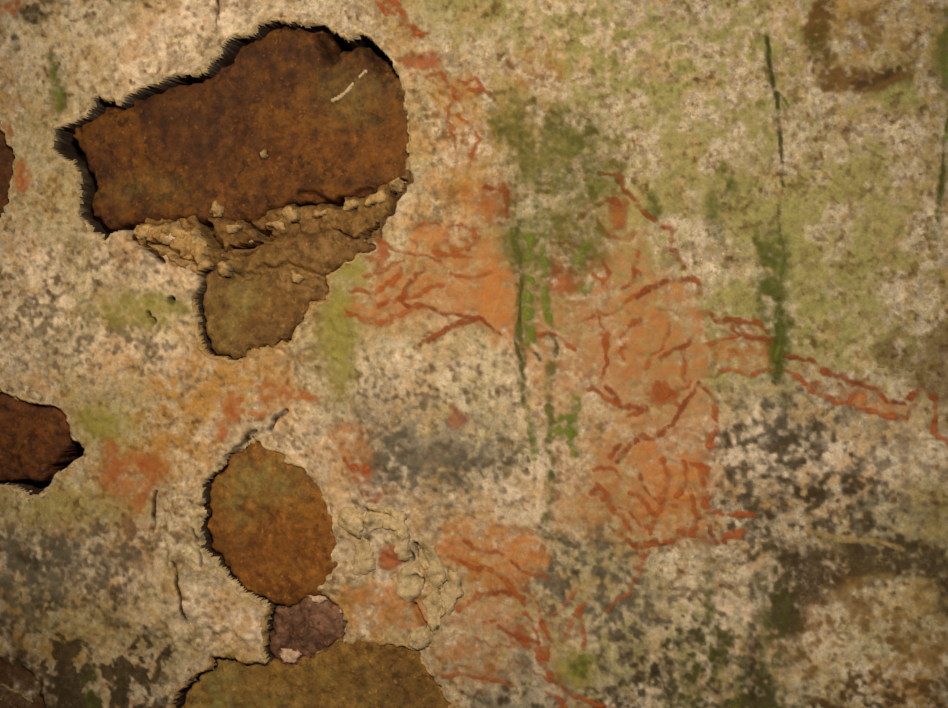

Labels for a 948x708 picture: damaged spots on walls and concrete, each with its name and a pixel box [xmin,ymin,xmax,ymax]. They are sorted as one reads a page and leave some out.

spalling [0,118,17,219]
spalling [48,16,414,366]
water stain [512,221,552,395]
spalling [0,381,85,501]
water stain [527,396,580,476]
spalling [169,437,464,708]